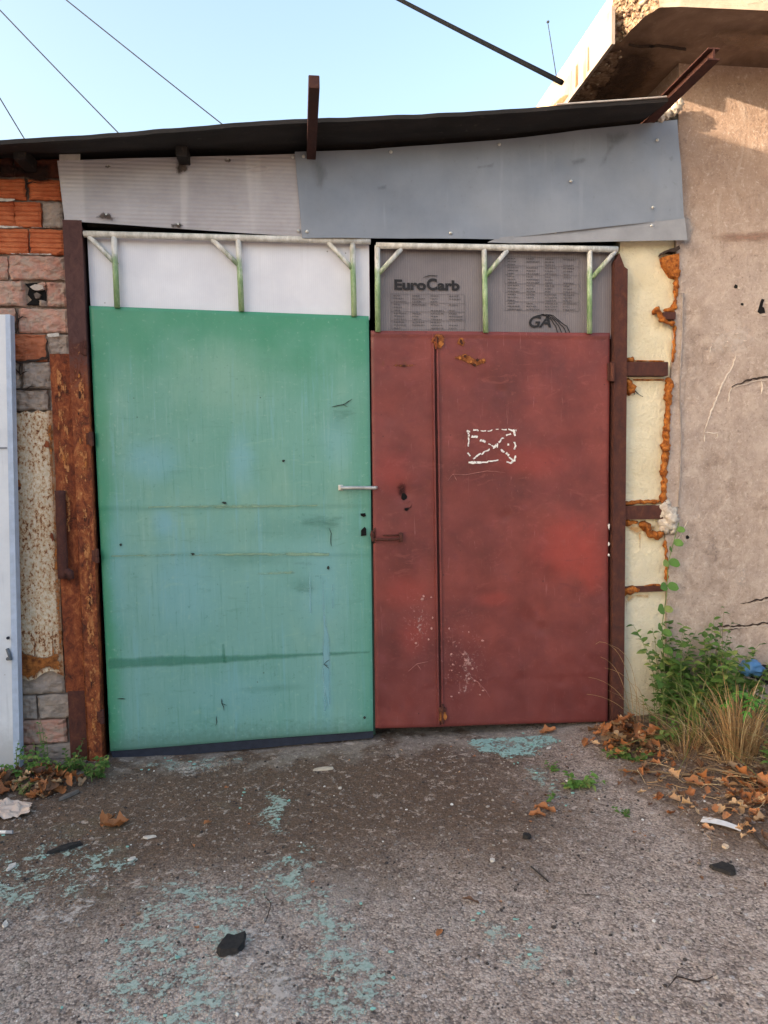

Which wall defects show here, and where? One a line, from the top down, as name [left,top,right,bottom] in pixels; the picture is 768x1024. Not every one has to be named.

crack [728,376,768,402]
rust [22,369,87,677]
rust [83,509,94,646]
crack [717,597,768,630]